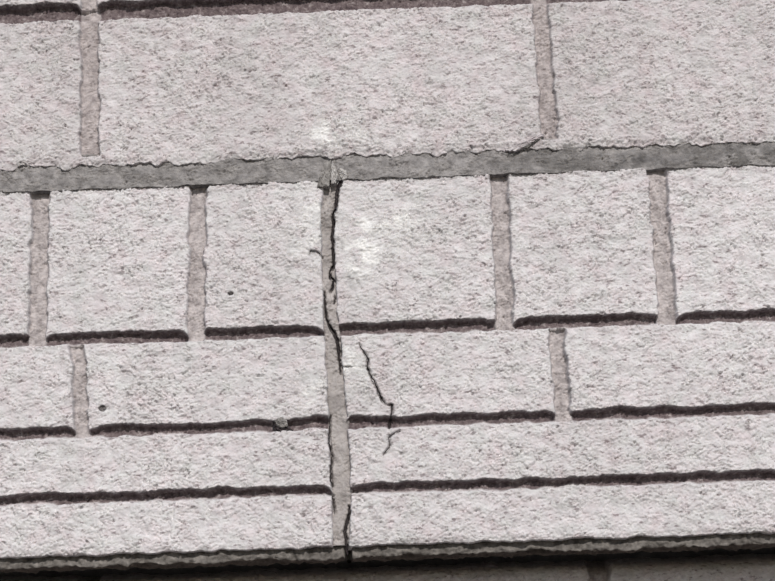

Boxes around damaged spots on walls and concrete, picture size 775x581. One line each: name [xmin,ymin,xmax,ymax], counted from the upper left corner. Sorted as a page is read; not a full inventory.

crack [309,169,400,454]
crack [328,417,351,555]